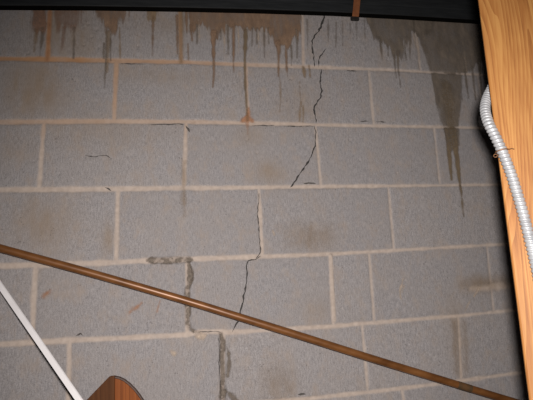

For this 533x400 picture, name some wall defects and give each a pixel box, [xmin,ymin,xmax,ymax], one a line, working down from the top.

damp [96,11,126,74]
damp [185,12,301,116]
crack [291,16,326,187]
damp [366,18,485,207]
crack [232,202,261,332]